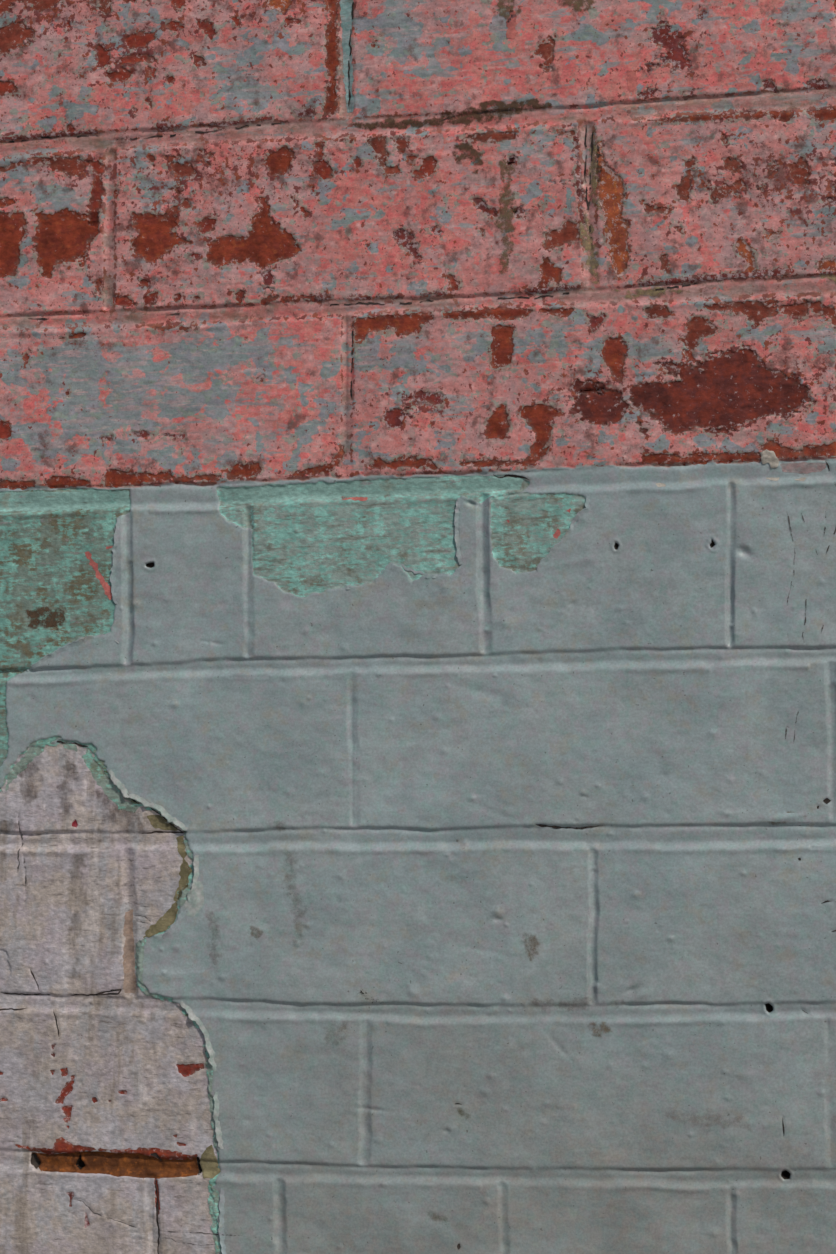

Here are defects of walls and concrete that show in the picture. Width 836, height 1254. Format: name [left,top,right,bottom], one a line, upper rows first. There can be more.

peeling [0,0,60,56]
peeling [92,0,216,83]
peeling [293,0,340,117]
peeling [626,17,692,100]
peeling [0,155,119,279]
peeling [131,147,334,305]
peeling [341,136,437,179]
peeling [524,129,630,295]
peeling [641,134,810,233]
peeling [647,107,836,122]
peeling [0,294,836,1254]
corrosion [35,1151,199,1179]